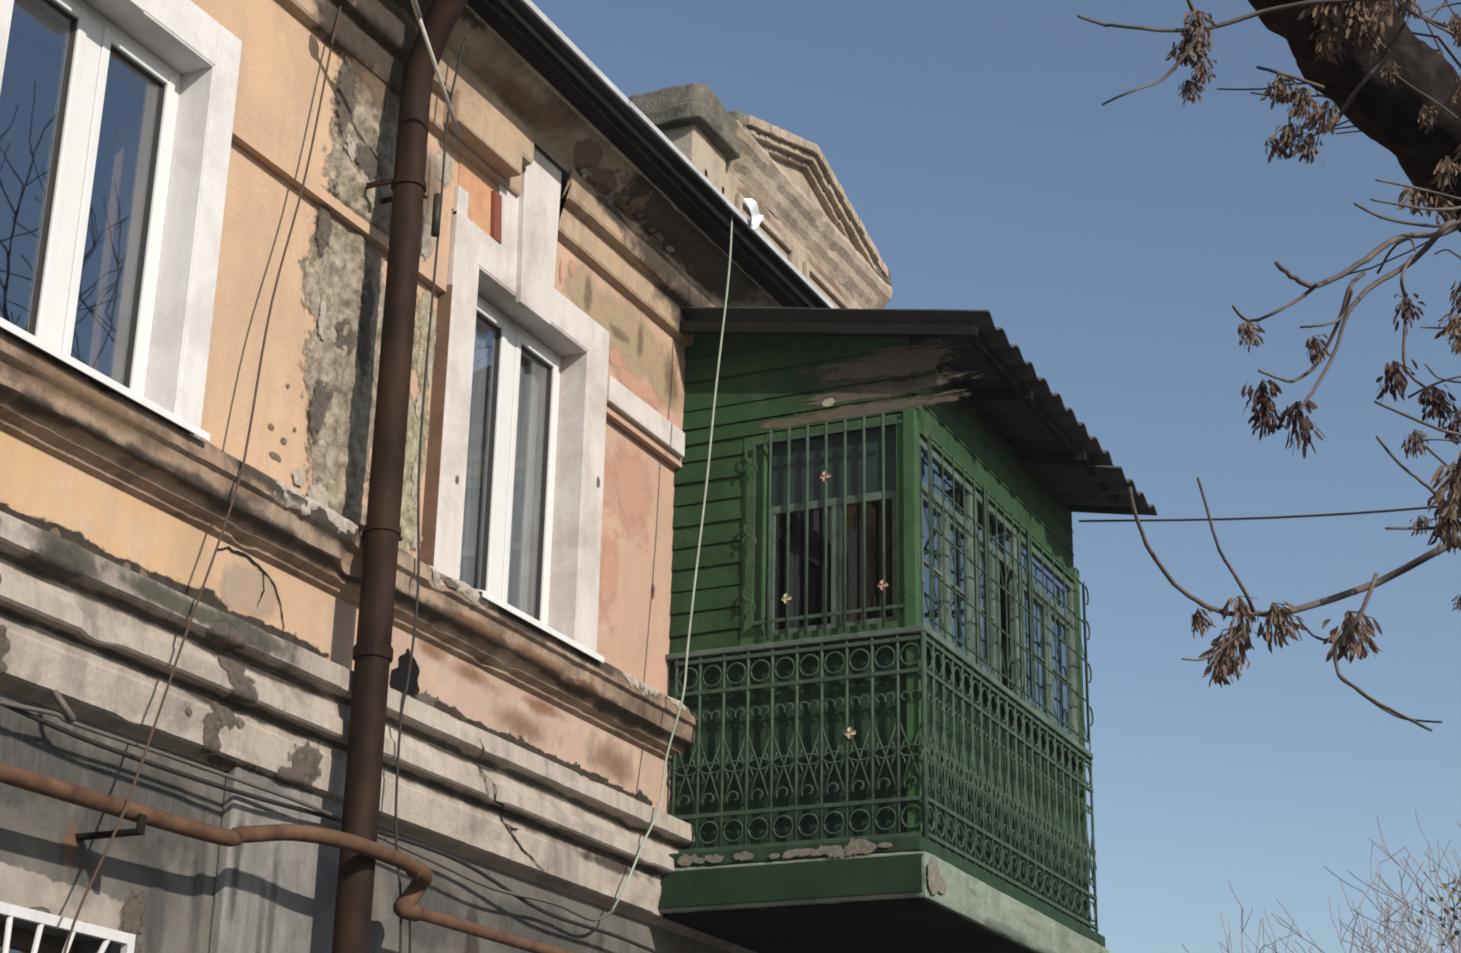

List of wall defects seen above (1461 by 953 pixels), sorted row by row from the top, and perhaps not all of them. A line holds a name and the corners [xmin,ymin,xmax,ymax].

spalling [268,53,399,538]
peeling [420,150,453,261]
leakage [598,174,765,326]
leakage [741,190,770,223]
peeling [398,290,436,556]
peeling [754,338,982,429]
peeling [0,502,329,658]
peeling [412,690,653,806]
spalling [677,838,892,866]